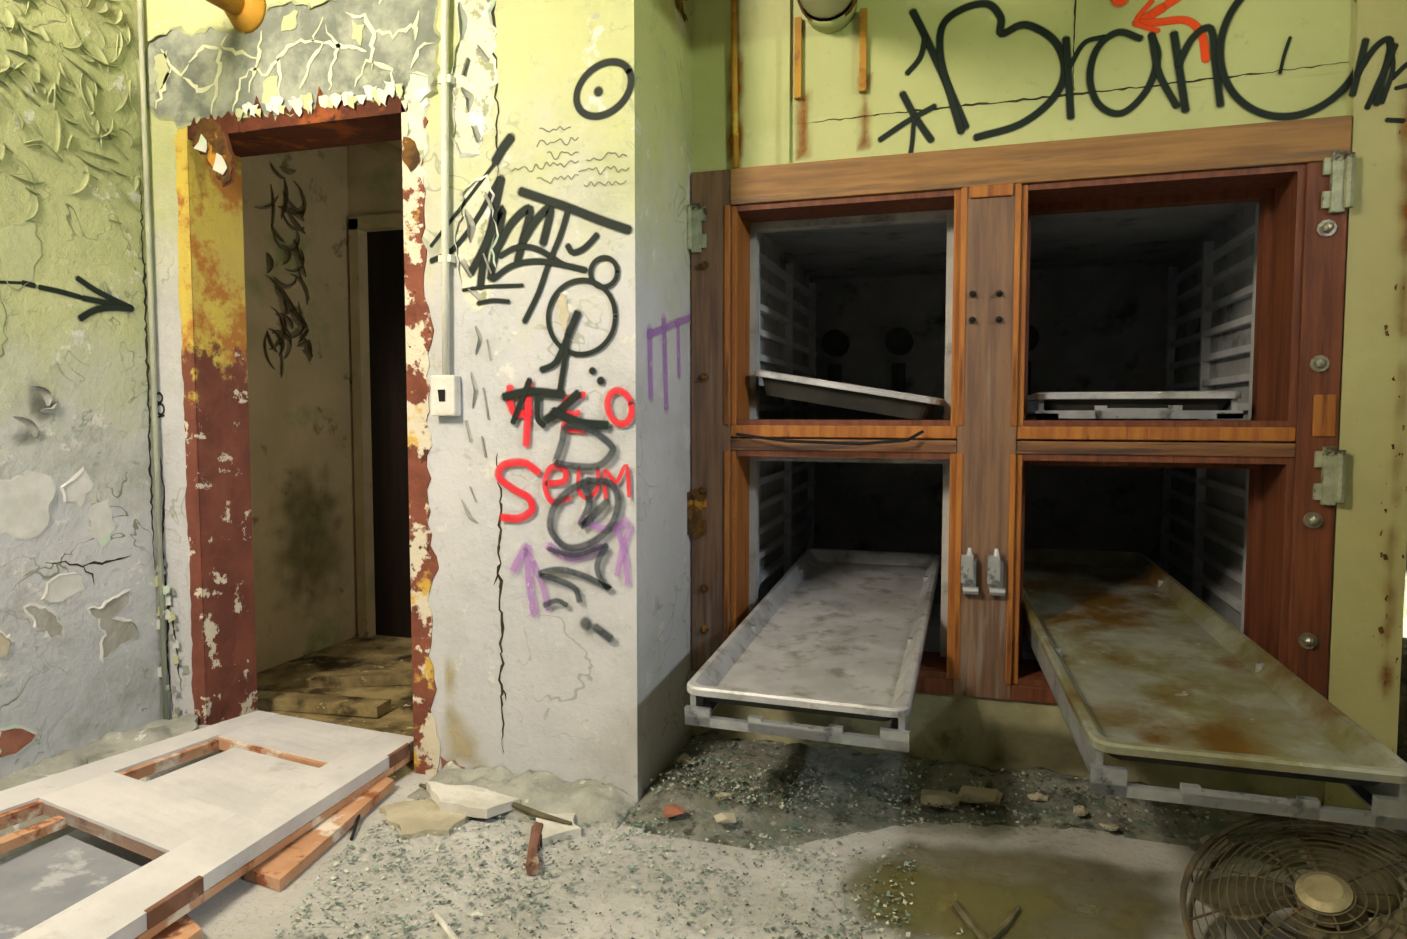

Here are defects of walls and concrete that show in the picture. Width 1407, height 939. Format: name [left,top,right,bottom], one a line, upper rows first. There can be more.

peeling [0,0,499,377]
crack [46,169,181,714]
peeling [465,372,489,458]
peeling [461,486,478,524]
spalling [23,572,85,641]
spalling [87,589,137,664]
crack [494,453,506,753]
flaking render [0,724,37,759]